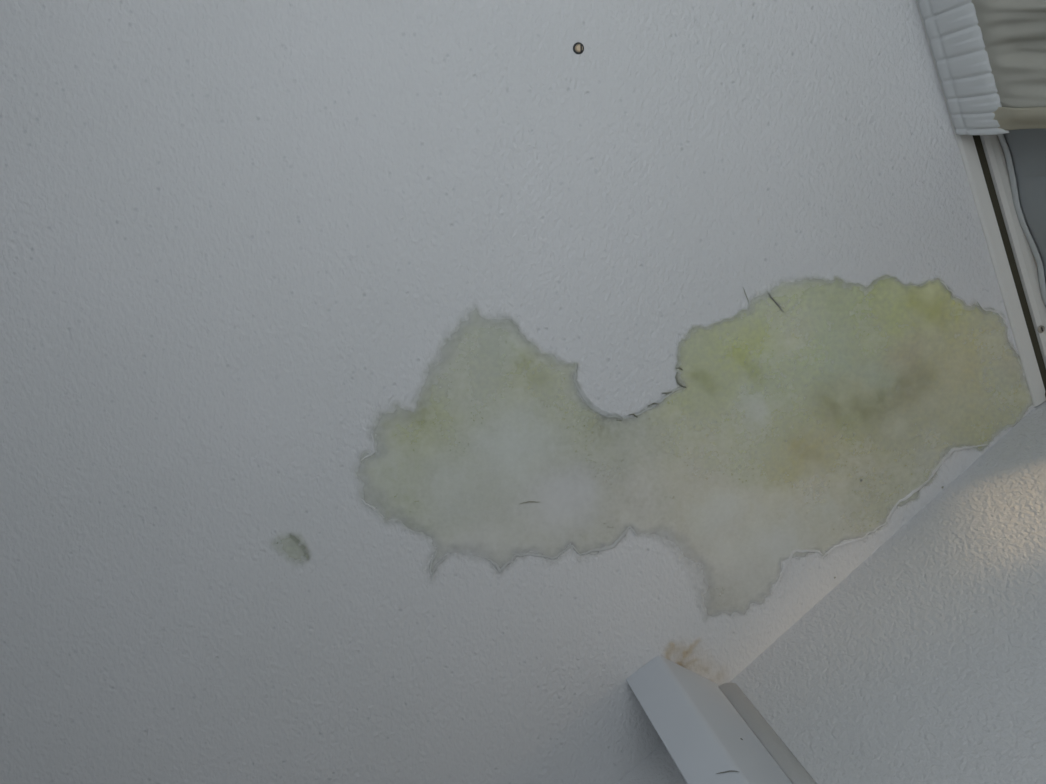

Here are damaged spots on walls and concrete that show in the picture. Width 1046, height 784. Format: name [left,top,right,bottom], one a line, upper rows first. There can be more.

water stain [762,280,1020,481]